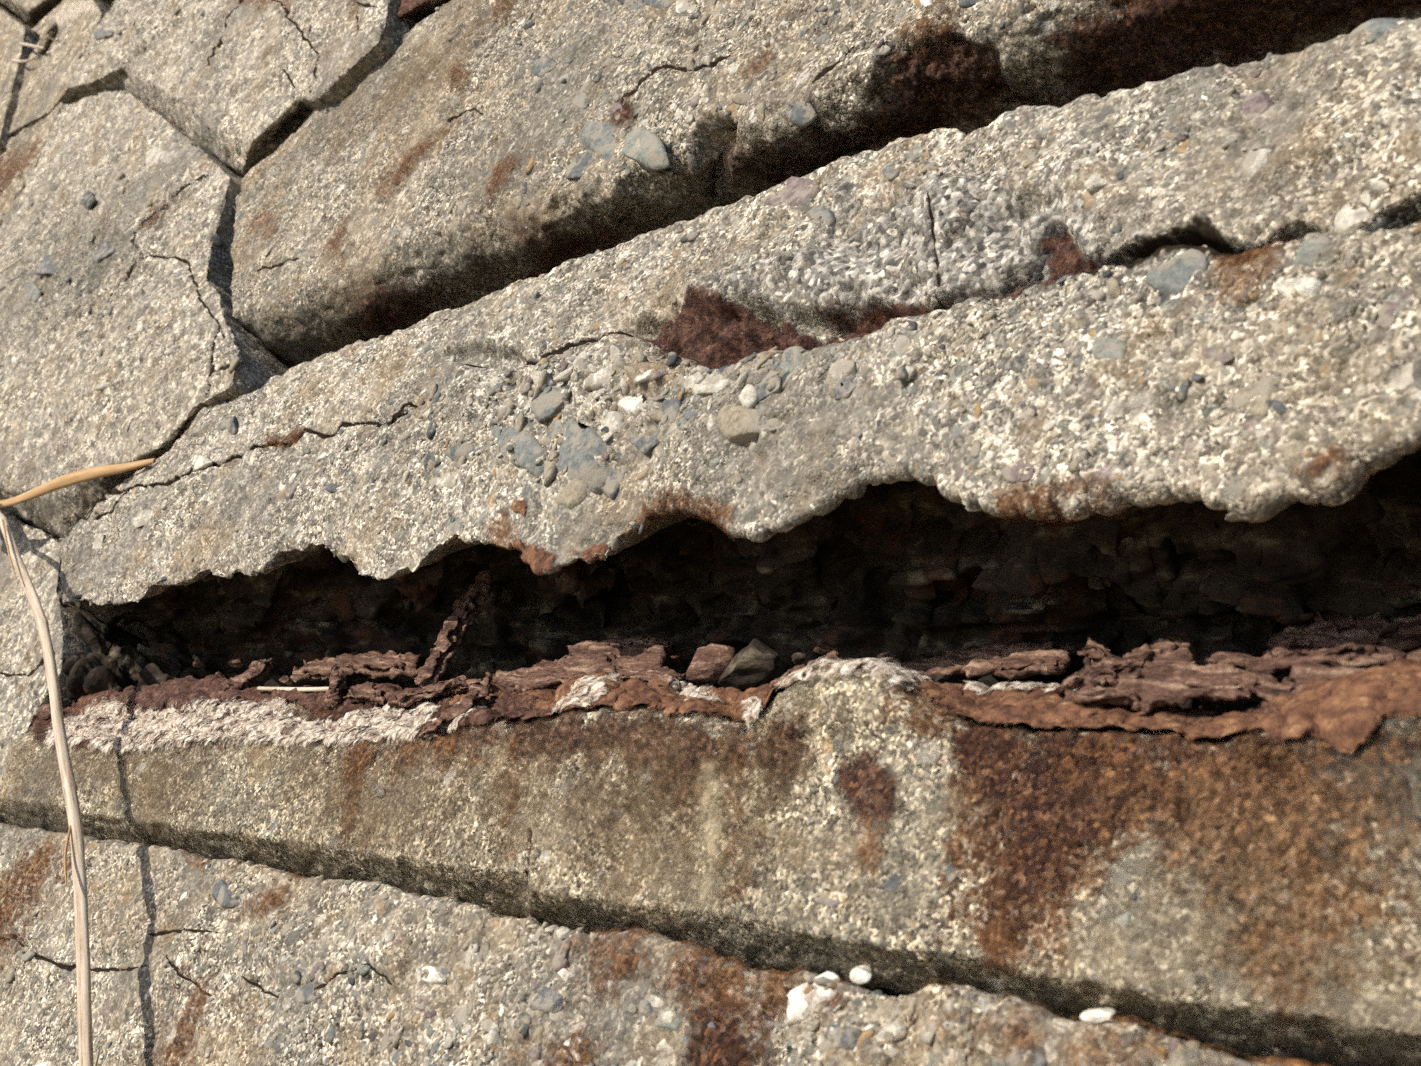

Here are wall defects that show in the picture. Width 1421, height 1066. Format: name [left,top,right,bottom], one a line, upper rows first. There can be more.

crack [205,0,319,93]
rust [726,0,1421,193]
crack [110,174,230,400]
crack [257,258,300,271]
crack [927,171,945,310]
crack [1083,216,1294,275]
spalling [1,0,1421,839]
rust [218,658,275,695]
rust [835,751,898,875]
rust [882,641,1421,1019]
rust [543,1025,596,1066]
rust [654,933,846,1066]